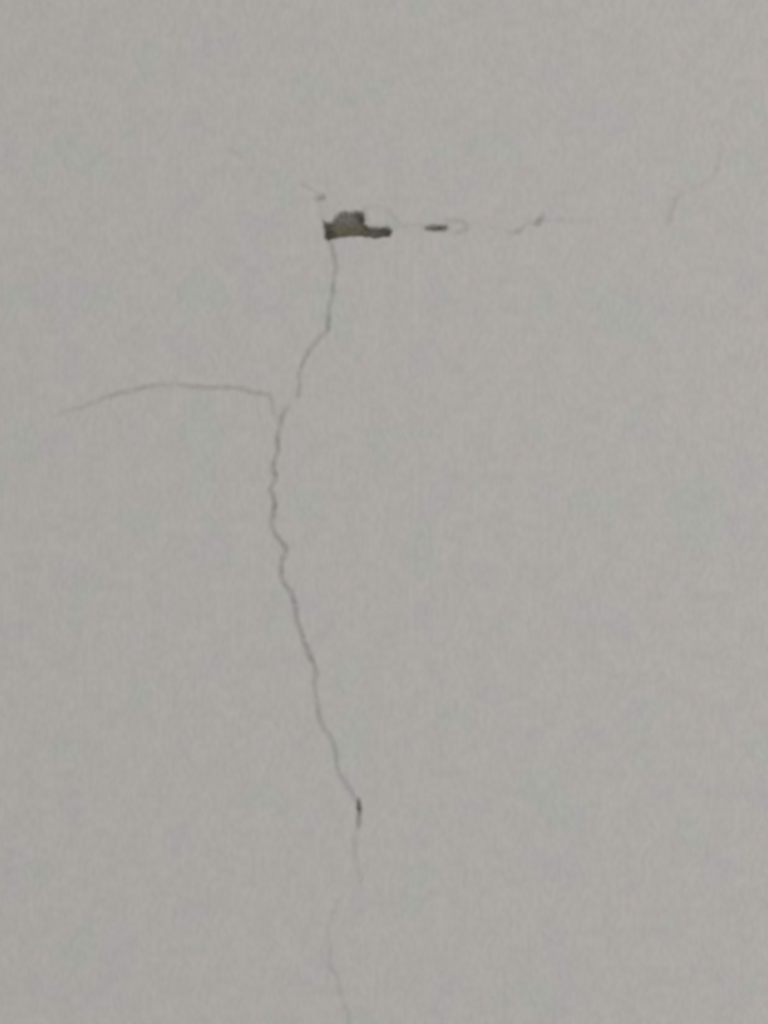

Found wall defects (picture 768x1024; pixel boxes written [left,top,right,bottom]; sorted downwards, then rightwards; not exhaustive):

flaking render [320,201,402,244]
crack [396,164,599,239]
crack [50,178,366,1024]